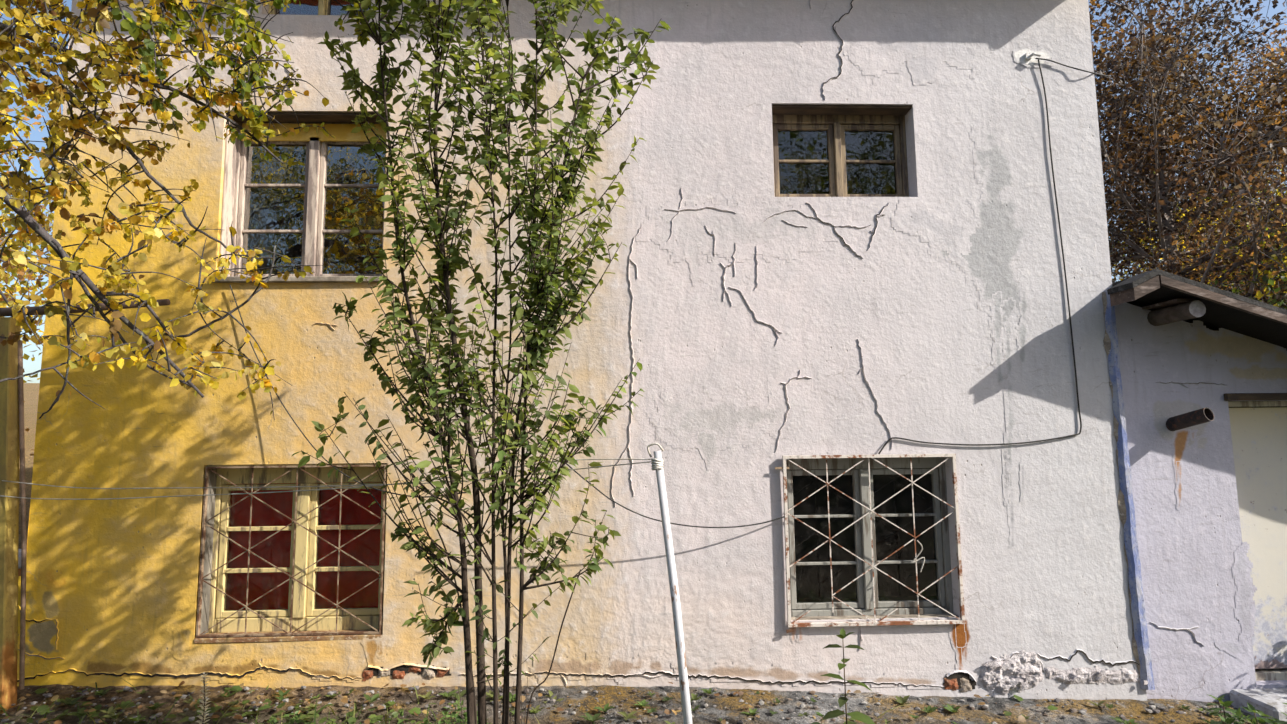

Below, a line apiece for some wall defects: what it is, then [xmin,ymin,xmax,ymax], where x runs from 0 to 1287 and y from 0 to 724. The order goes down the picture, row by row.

crack [809,0,854,100]
crack [611,192,892,501]
water stain [891,119,1033,549]
peeling [1102,292,1113,399]
corrosion [1172,429,1198,510]
spalling [943,416,1148,695]
peeling [18,619,63,658]
crack [17,605,362,683]
spalling [362,662,451,681]
corrosion [949,618,972,671]